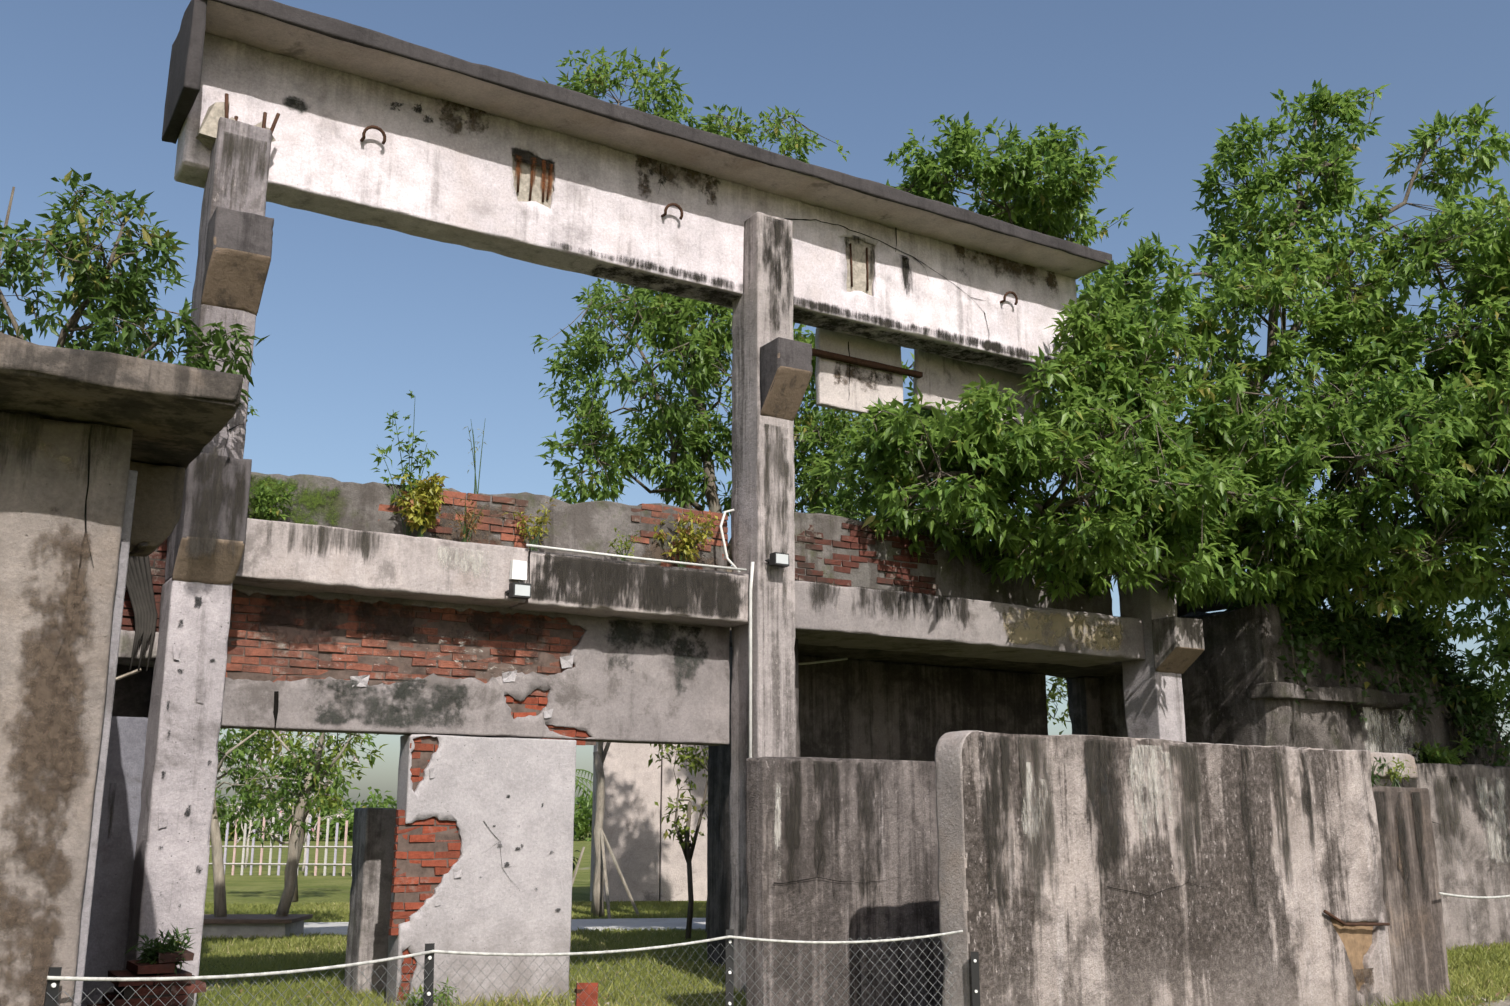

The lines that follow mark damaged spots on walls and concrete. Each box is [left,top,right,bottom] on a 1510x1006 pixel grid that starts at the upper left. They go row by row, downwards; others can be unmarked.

crack [784,218,989,340]
damp [763,218,1057,364]
corrosion [834,361,893,391]
damp [0,524,94,1006]
peeling [173,596,202,673]
damp [316,678,467,728]
spalling [210,589,596,745]
spalling [410,735,438,791]
damp [439,553,743,690]
damp [1085,739,1201,885]
spalling [388,810,462,1001]
corrosion [1354,968,1374,993]